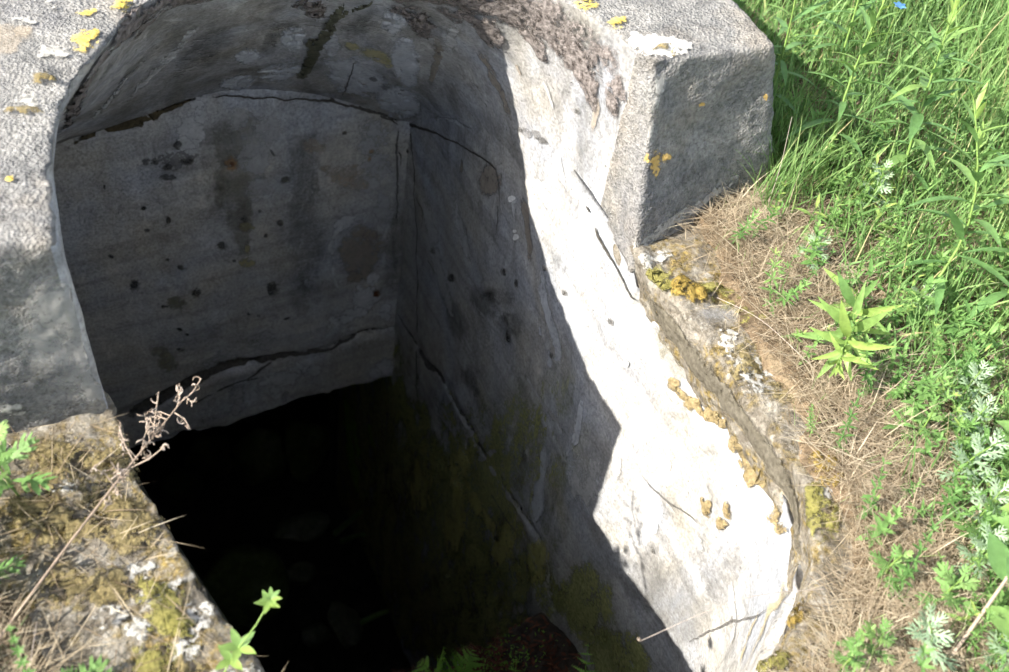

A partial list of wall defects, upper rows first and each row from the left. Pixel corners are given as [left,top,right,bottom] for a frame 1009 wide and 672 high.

crack [586,206,635,300]
crack [129,328,376,417]
crack [395,131,532,535]
leakage [523,446,548,524]
crack [689,609,766,642]